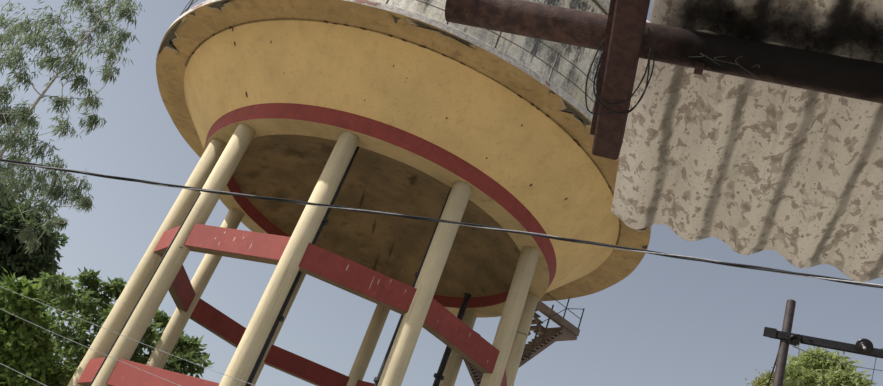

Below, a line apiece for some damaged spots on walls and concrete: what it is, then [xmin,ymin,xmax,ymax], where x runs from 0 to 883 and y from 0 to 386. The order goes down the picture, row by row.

peeling [157,0,234,59]
peeling [546,80,591,128]